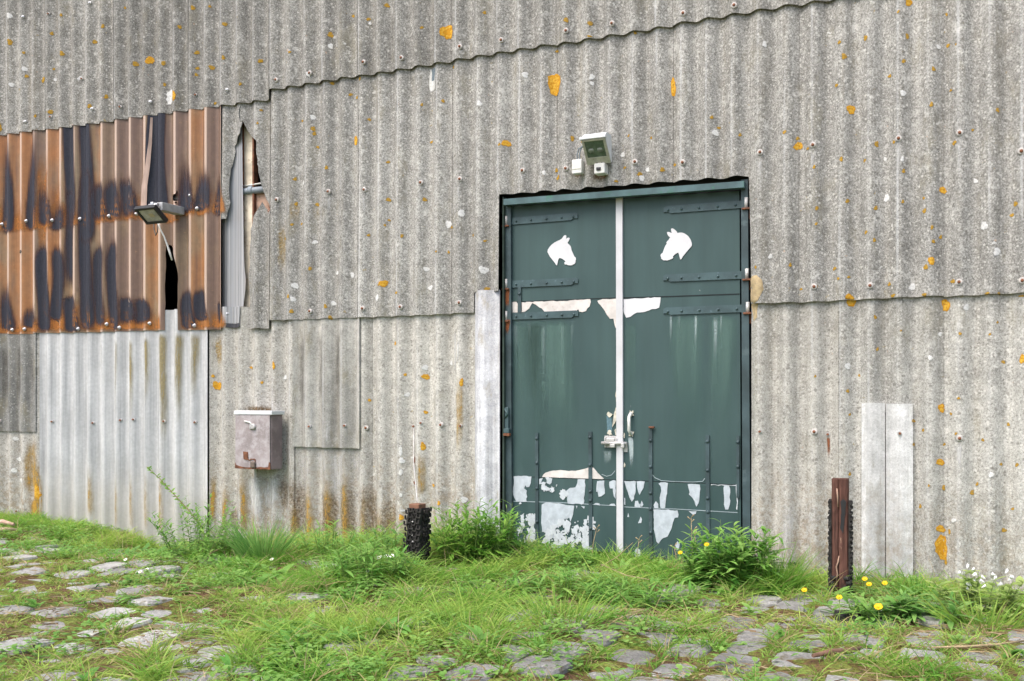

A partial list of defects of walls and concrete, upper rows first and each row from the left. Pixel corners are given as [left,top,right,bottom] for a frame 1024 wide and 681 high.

peeling [513,297,661,327]
damp [11,451,42,516]
damp [210,461,405,537]
peeling [513,468,738,551]